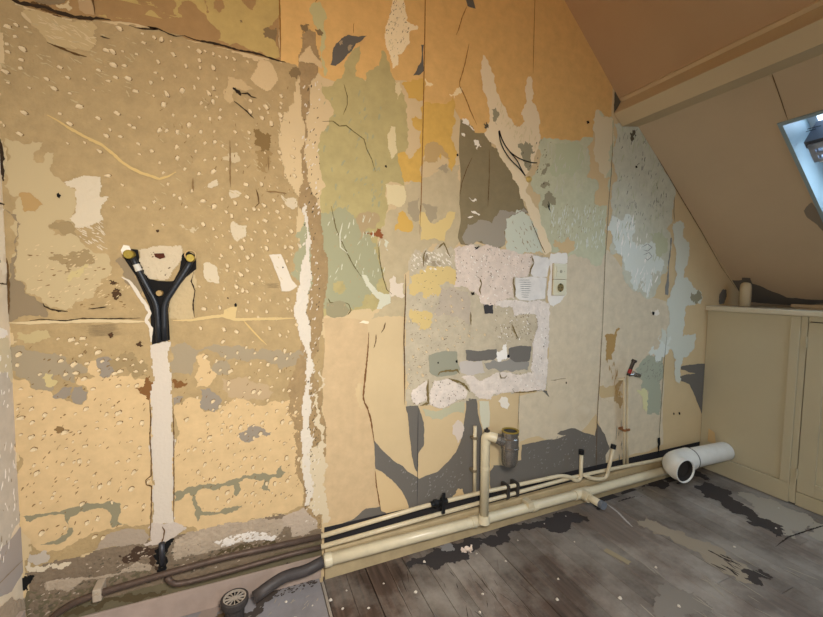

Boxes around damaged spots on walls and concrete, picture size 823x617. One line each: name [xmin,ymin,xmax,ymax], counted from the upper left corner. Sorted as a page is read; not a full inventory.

flaking render [23,0,97,52]
crack [12,0,110,39]
crack [47,42,87,57]
crack [129,0,286,63]
flaking render [223,60,278,103]
flaking render [0,138,112,310]
flaking render [121,245,183,280]
flaking render [169,271,197,320]
flaking render [496,342,509,362]
damp [300,371,700,543]
flaking render [375,471,409,513]
damp [171,535,285,571]